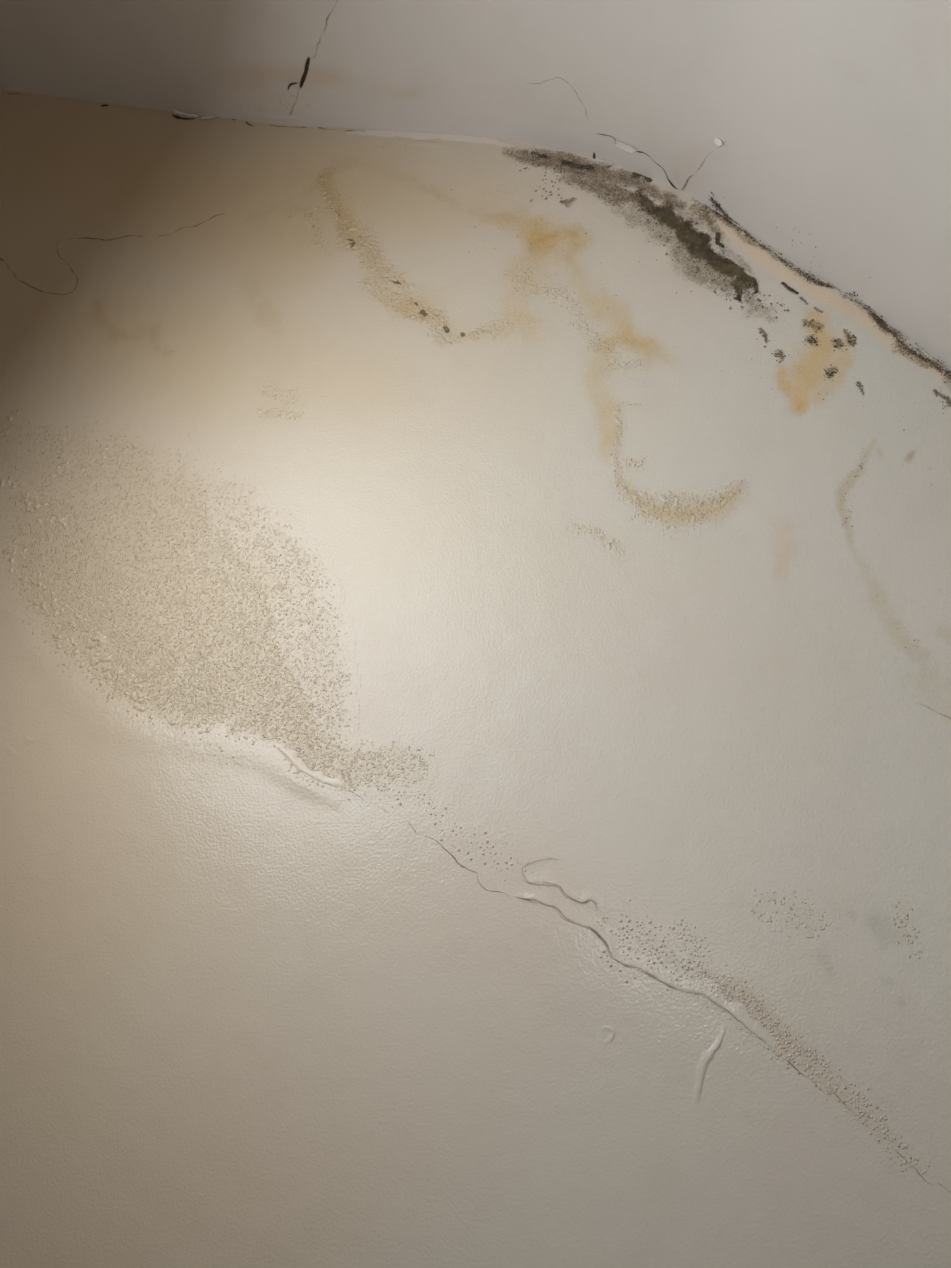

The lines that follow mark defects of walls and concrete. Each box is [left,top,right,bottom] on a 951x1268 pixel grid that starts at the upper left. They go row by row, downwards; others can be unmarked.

crack [288,58,310,90]
crack [593,134,688,189]
damp [508,149,857,400]
damp [844,292,951,414]
crack [275,743,343,787]
crack [446,850,801,1074]